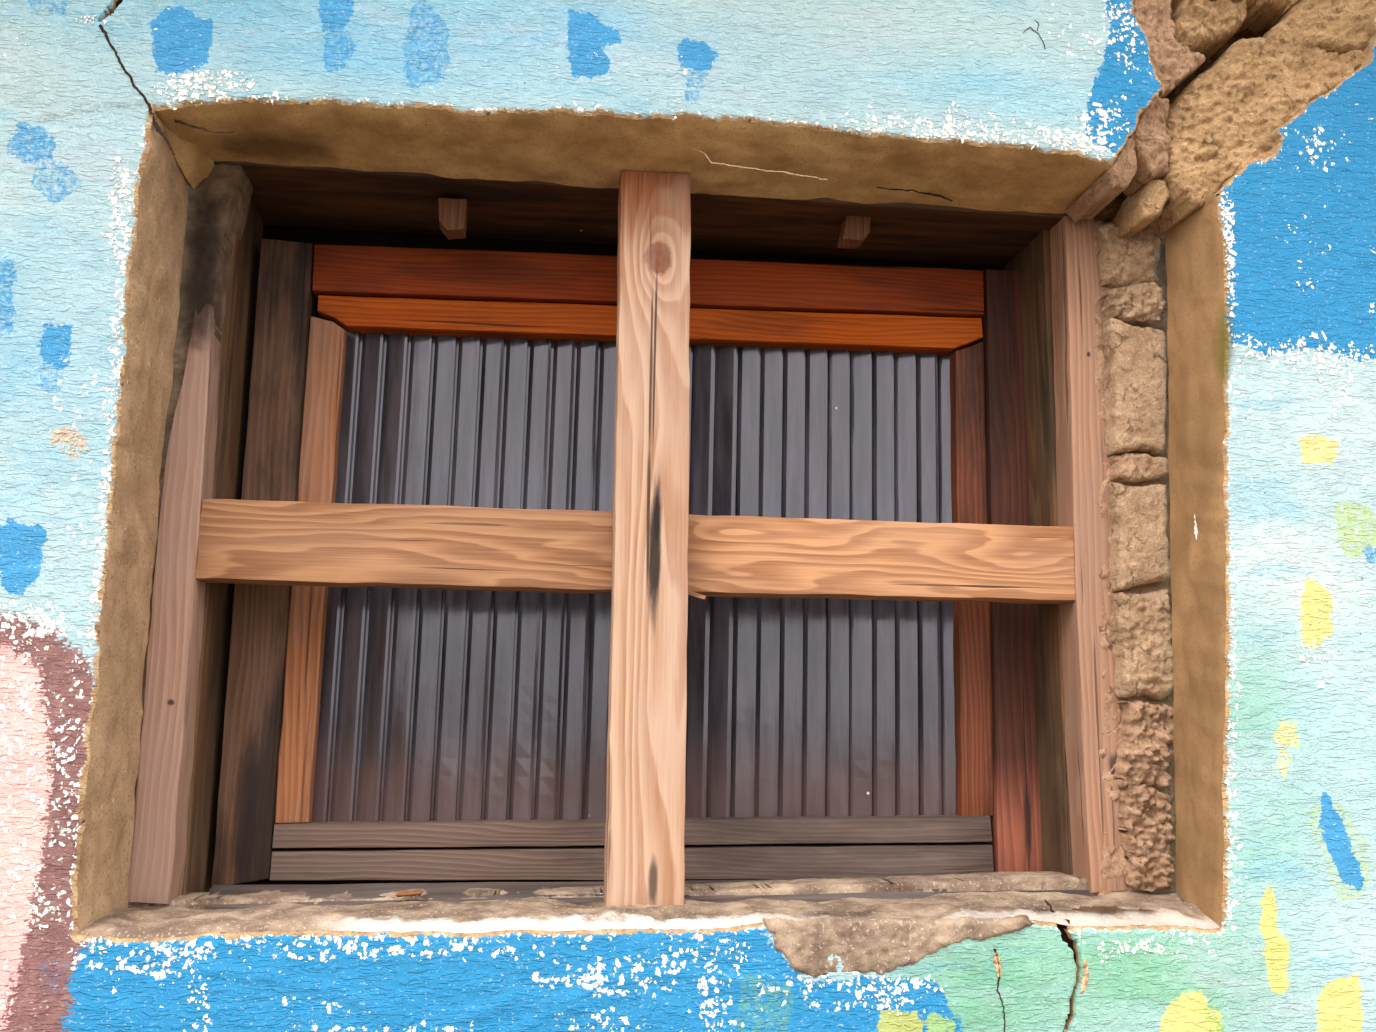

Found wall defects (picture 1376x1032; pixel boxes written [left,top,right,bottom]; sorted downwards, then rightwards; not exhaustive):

crack [99,0,153,115]
spalling [845,0,1376,925]
peeling [762,915,1035,1016]
crack [993,948,1006,1032]
crack [1044,899,1089,1032]